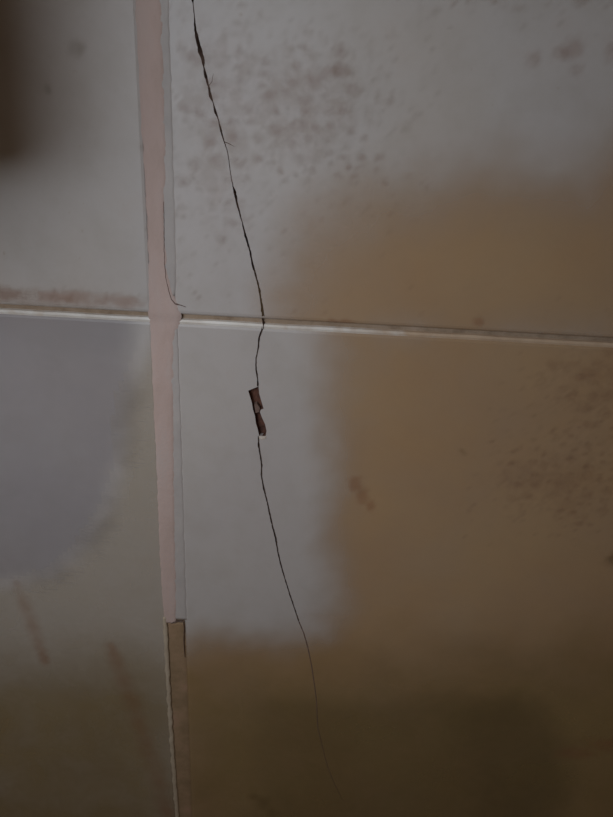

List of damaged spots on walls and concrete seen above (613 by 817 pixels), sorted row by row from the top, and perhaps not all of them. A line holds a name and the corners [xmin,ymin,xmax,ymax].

crack [164,238,185,307]
crack [192,0,265,386]
crack [258,436,341,797]
damp [186,185,613,817]